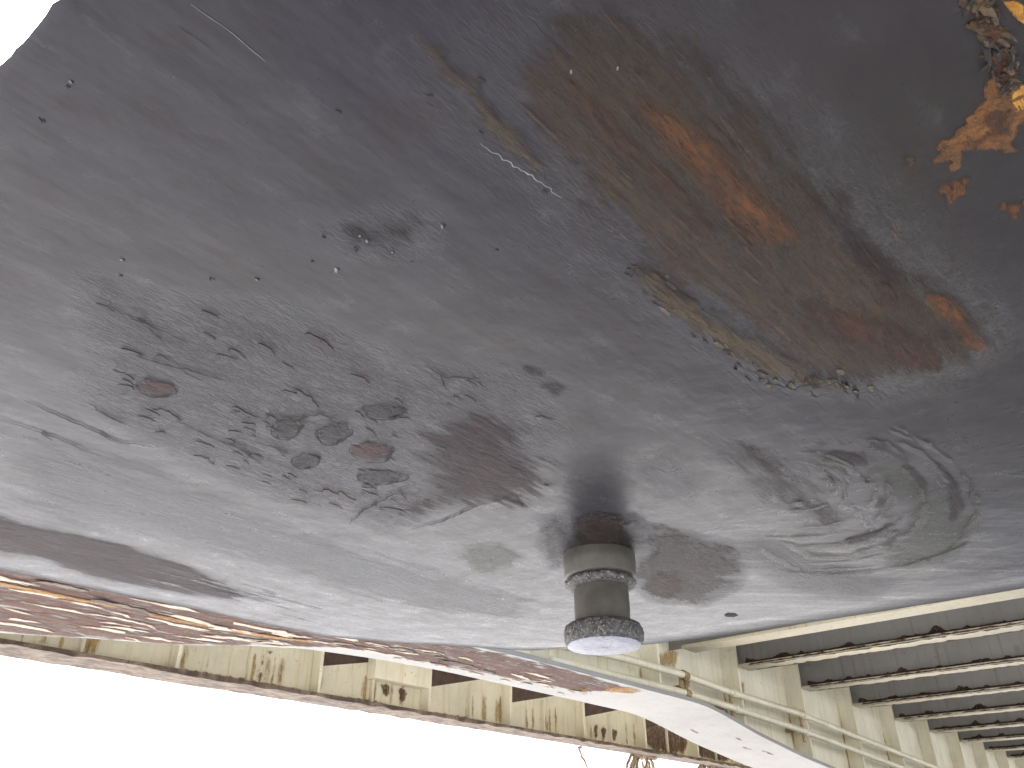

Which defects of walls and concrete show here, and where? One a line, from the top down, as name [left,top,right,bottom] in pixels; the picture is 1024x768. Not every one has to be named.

peeling [958,0,1024,103]
corrosion [934,76,1024,203]
peeling [113,369,181,434]
peeling [194,398,414,516]
damp [406,413,554,515]
damp [0,453,520,622]